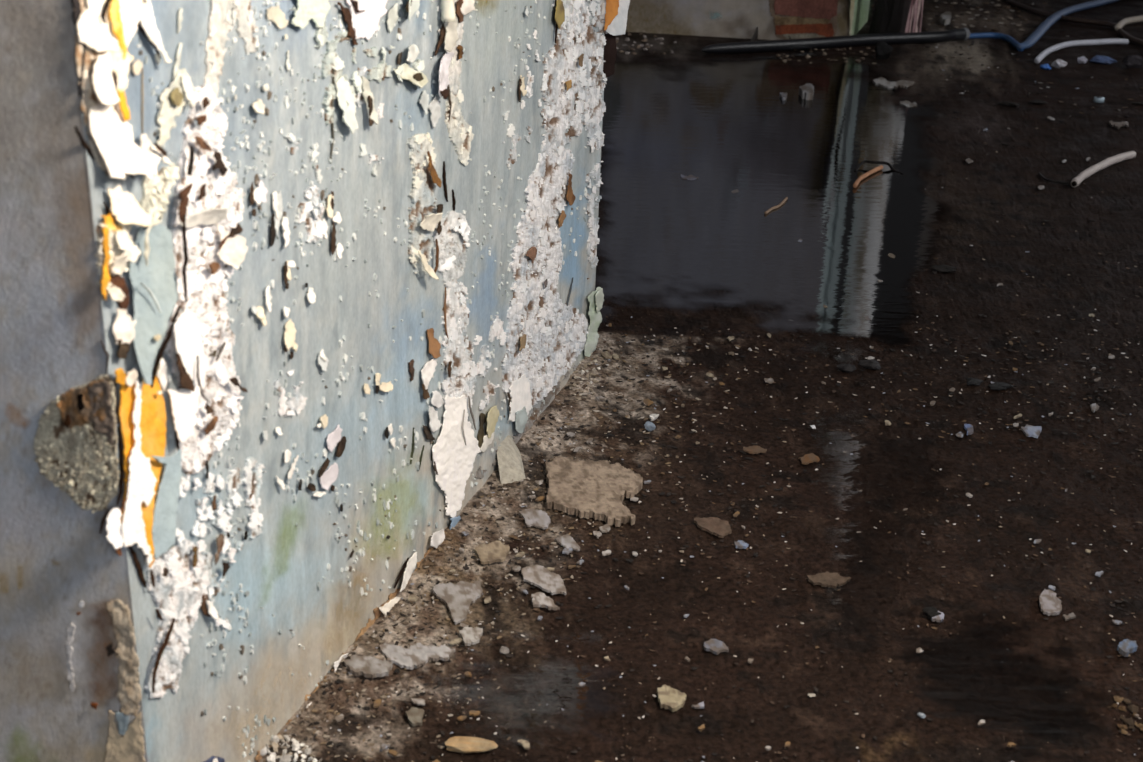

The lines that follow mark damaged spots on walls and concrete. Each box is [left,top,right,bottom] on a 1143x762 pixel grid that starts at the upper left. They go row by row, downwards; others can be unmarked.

peeling [34,0,630,762]
spalling [769,0,839,39]